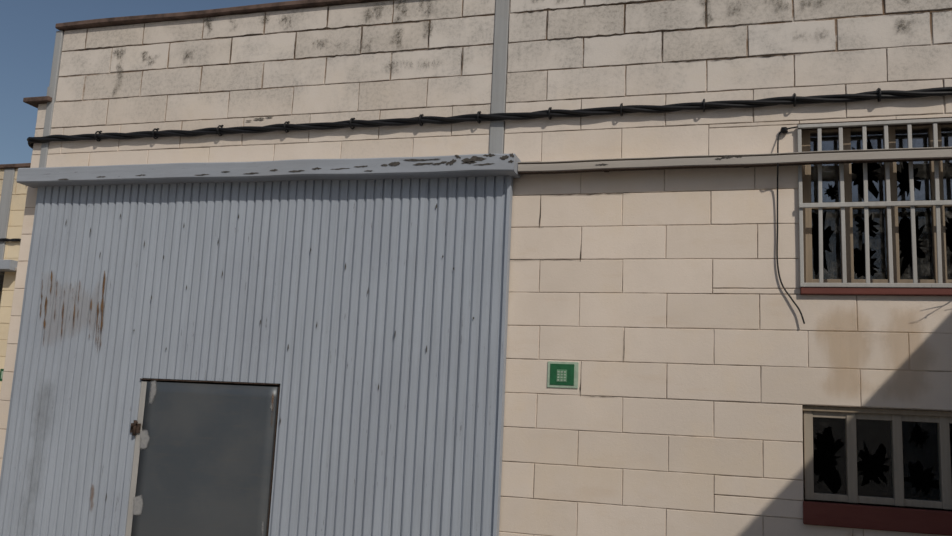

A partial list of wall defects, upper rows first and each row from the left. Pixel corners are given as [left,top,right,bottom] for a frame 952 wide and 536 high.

corrosion [40,271,105,345]